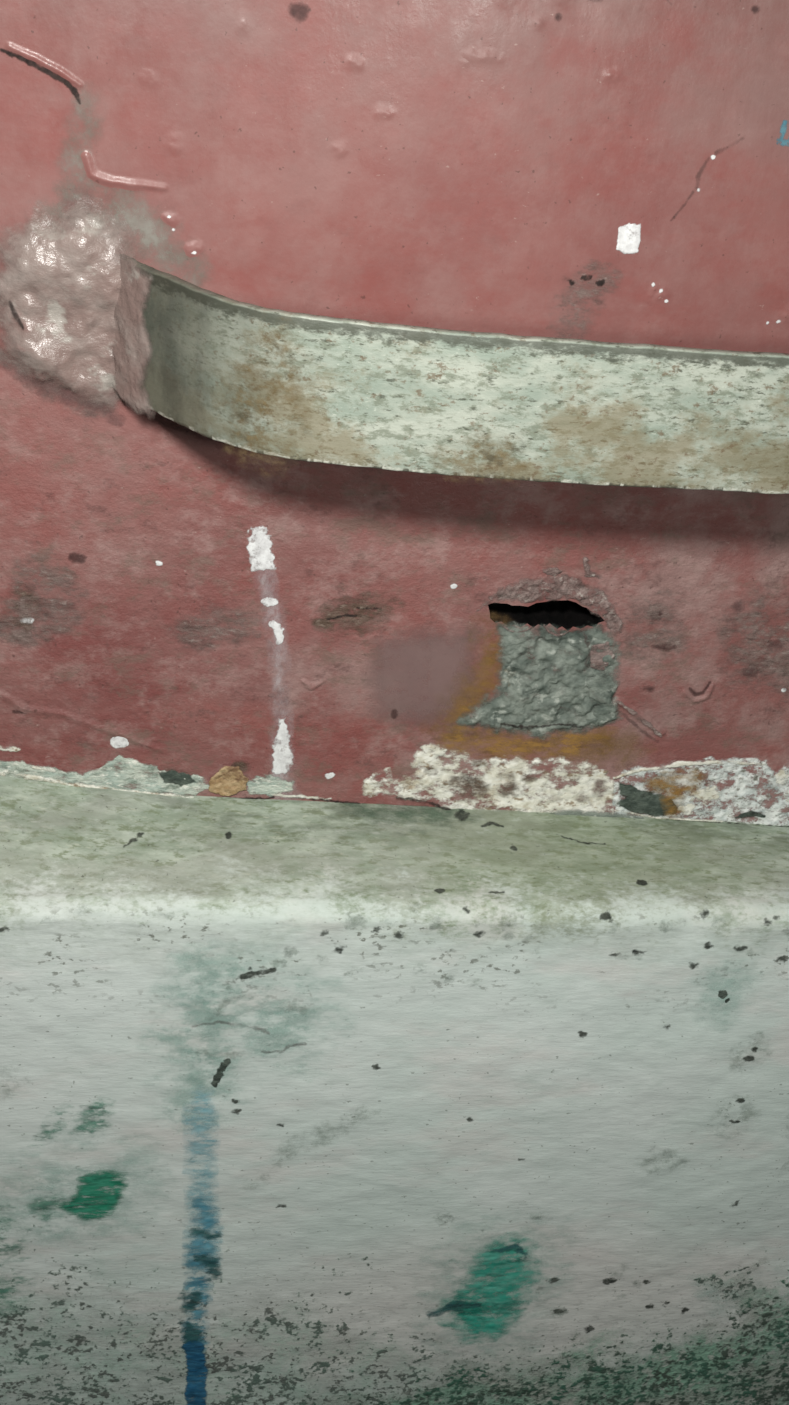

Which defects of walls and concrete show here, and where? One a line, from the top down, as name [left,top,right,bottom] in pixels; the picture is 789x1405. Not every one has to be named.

rust [453,443,523,473]
flaking render [457,557,623,738]
peeling [363,744,789,826]